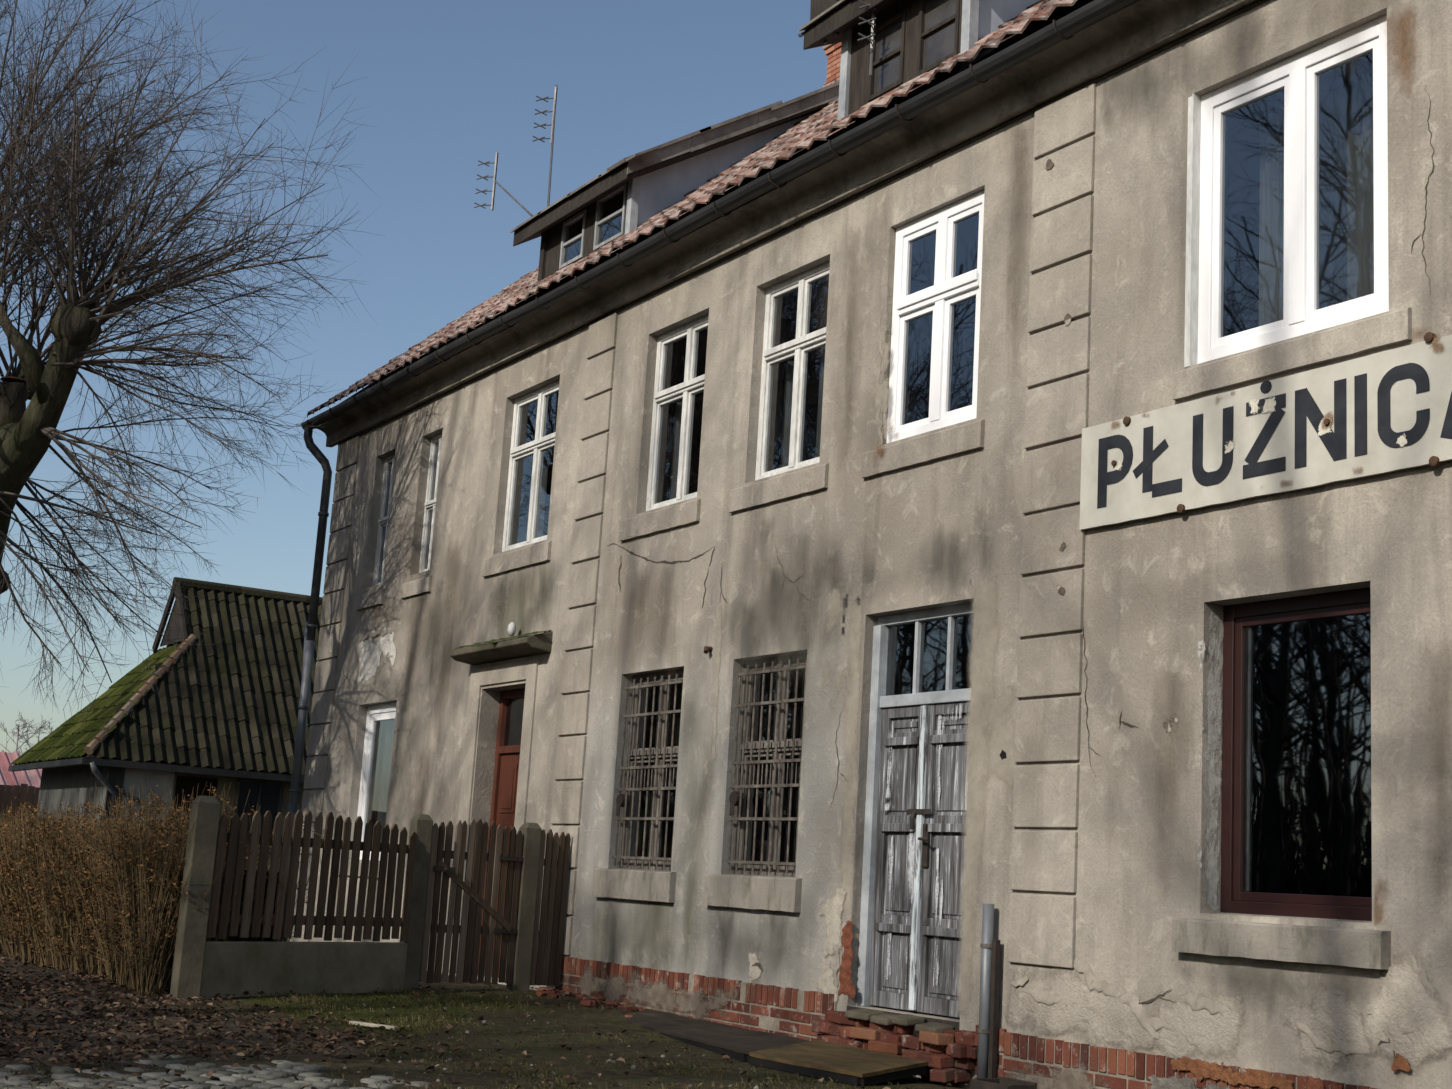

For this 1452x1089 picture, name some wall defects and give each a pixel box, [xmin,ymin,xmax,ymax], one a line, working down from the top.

crack [1411,90,1434,285]
crack [607,543,728,607]
peeling [358,627,396,683]
flaking render [748,952,763,983]
flaking render [816,888,856,1003]
flaking render [1171,1056,1342,1089]
flaking render [1391,1053,1410,1072]